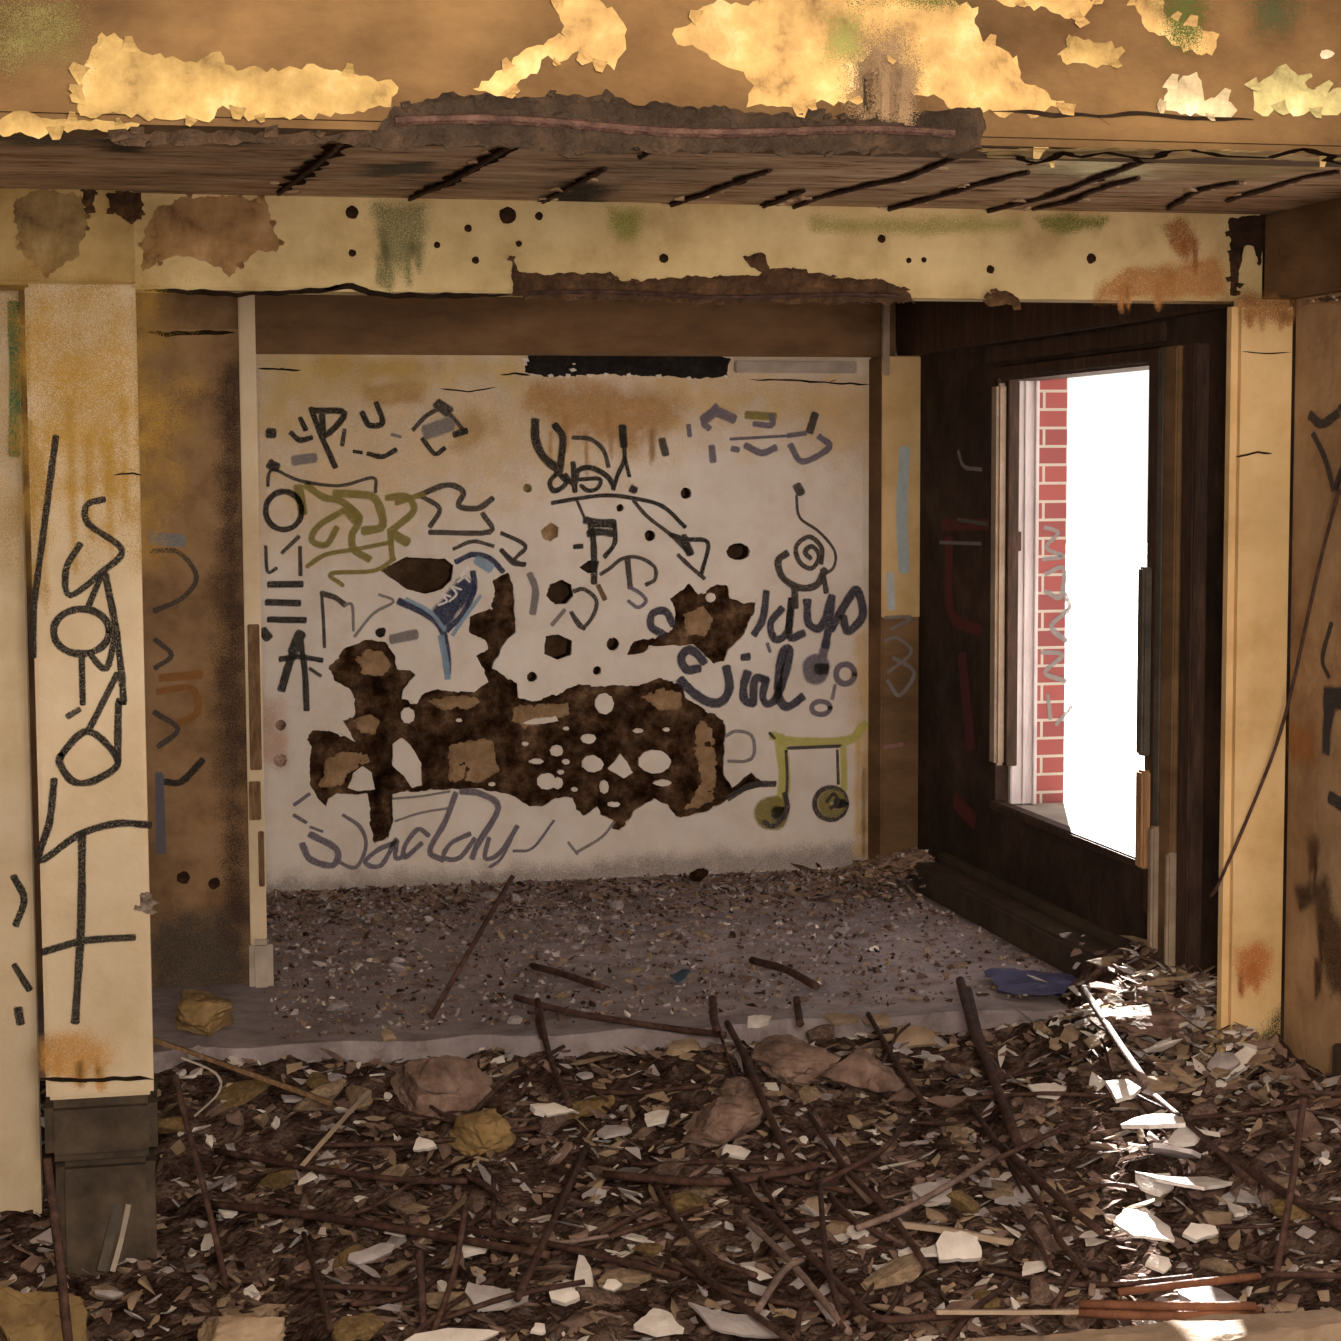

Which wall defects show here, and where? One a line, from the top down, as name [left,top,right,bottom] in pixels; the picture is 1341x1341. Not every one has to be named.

spalling [0,0,1341,296]
corrosion [1092,216,1296,332]
spalling [381,557,453,594]
flaking render [307,573,761,843]